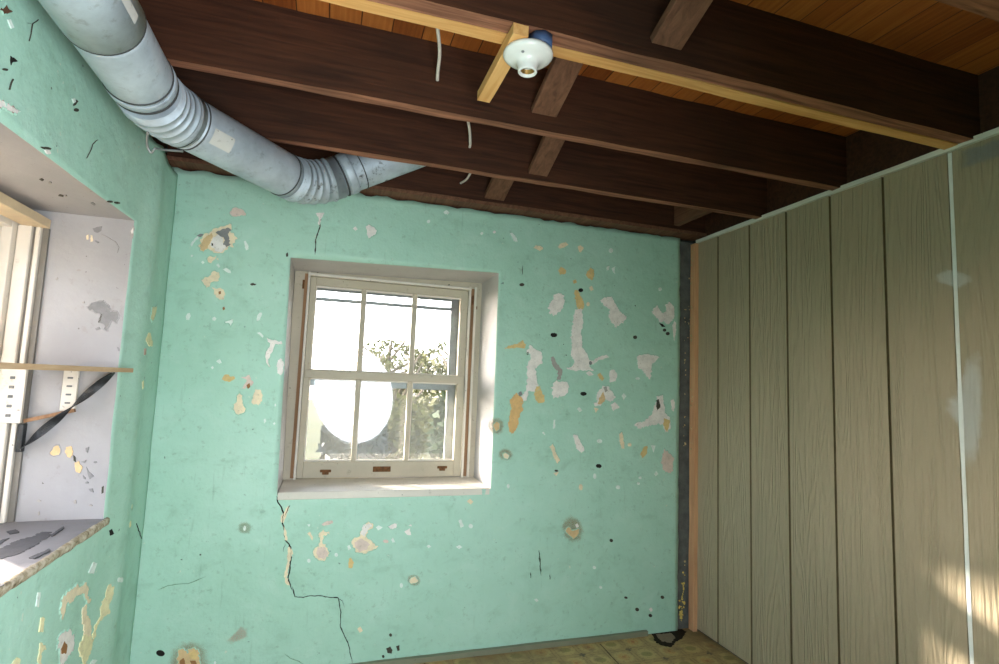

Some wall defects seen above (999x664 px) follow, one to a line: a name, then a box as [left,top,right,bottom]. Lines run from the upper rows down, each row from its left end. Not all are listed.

peeling [0,56,21,116]
peeling [191,207,249,327]
peeling [82,300,120,332]
peeling [488,265,627,435]
peeling [651,301,676,340]
peeling [633,394,675,433]
peeling [0,526,64,559]
peeling [307,520,412,568]
crack [277,500,352,659]
peeling [35,592,47,664]
peeling [59,562,123,664]
flaking render [156,640,216,664]